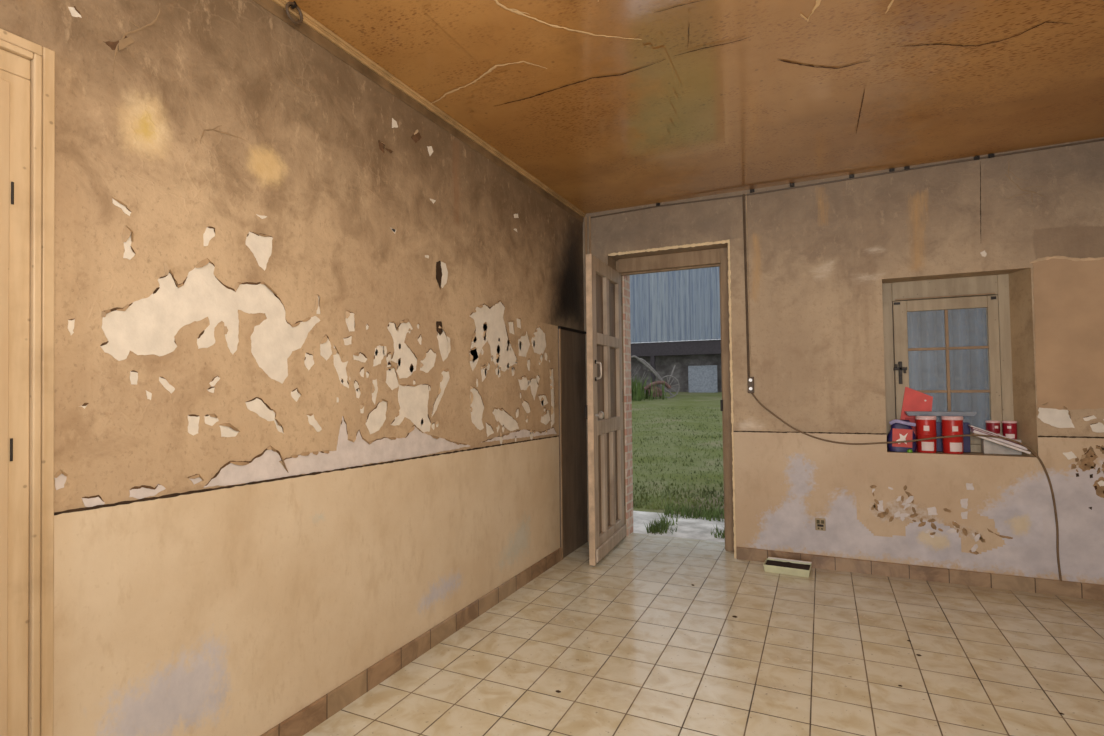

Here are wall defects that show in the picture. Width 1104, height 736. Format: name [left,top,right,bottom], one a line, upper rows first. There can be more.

crack [901,22,1069,47]
crack [431,0,751,106]
crack [780,60,868,69]
peeling [112,197,136,260]
peeling [100,226,557,488]
peeling [54,469,68,490]
peeling [82,495,105,507]
peeling [129,484,166,499]
spalling [856,480,1013,555]